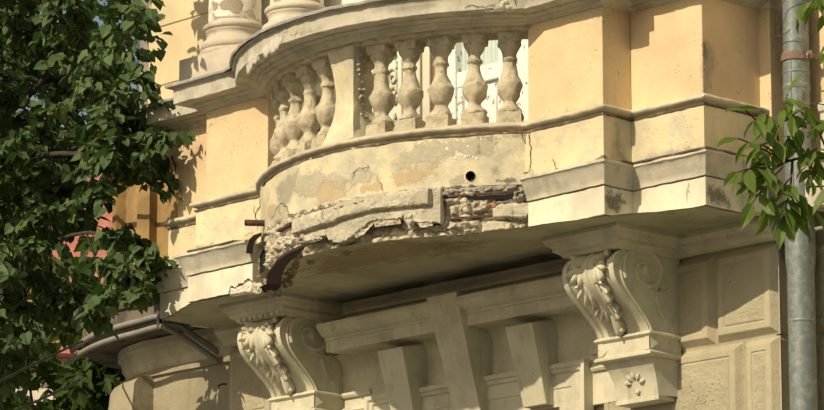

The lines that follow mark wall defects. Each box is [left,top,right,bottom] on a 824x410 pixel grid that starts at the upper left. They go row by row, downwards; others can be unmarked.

peeling [212,0,246,20]
water stain [701,43,713,92]
peeling [393,135,497,186]
spalling [354,175,528,238]
water stain [605,190,626,213]
water stain [708,185,731,206]
spalling [230,167,381,299]